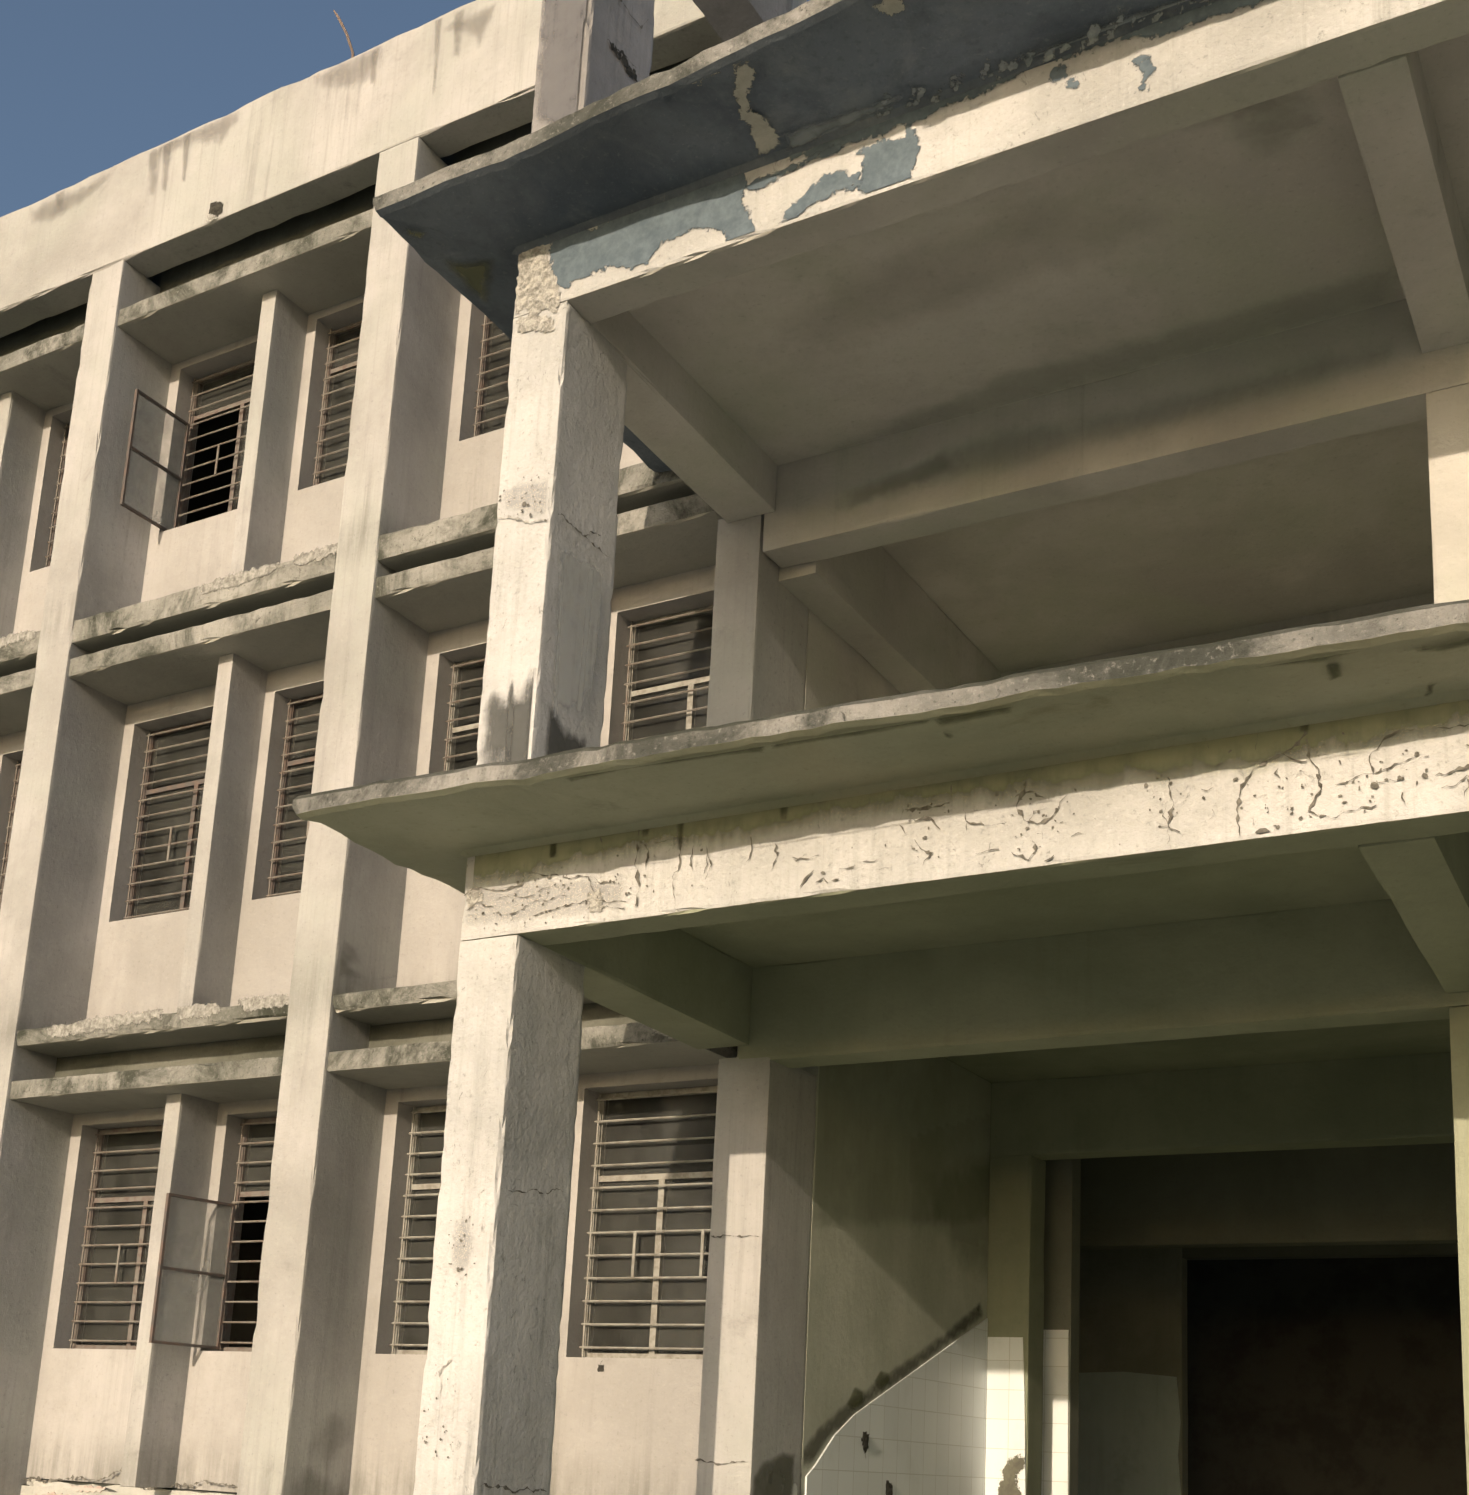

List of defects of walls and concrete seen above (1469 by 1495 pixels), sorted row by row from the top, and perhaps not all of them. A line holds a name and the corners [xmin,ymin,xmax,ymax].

peeling [515,0,1263,334]
leakage [484,679,533,763]
leakage [546,553,600,755]
crack [1144,701,1469,844]
crack [464,774,1120,916]
peeling [998,1454,1025,1495]